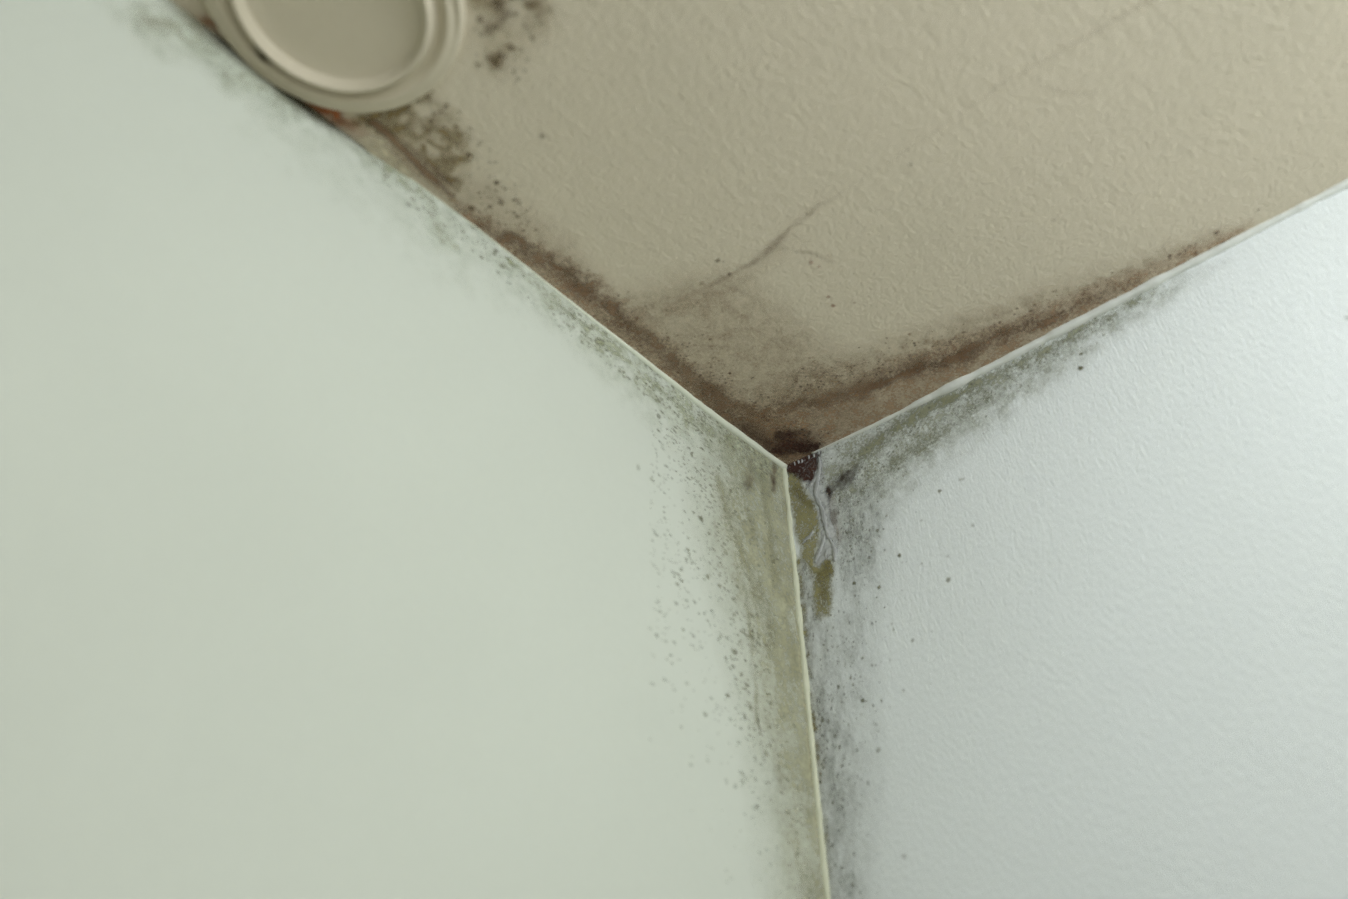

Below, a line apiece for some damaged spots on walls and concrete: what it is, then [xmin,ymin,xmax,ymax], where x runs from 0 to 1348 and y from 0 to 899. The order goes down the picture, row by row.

damp [274,85,470,183]
peeling [794,451,838,566]
damp [461,181,1242,899]